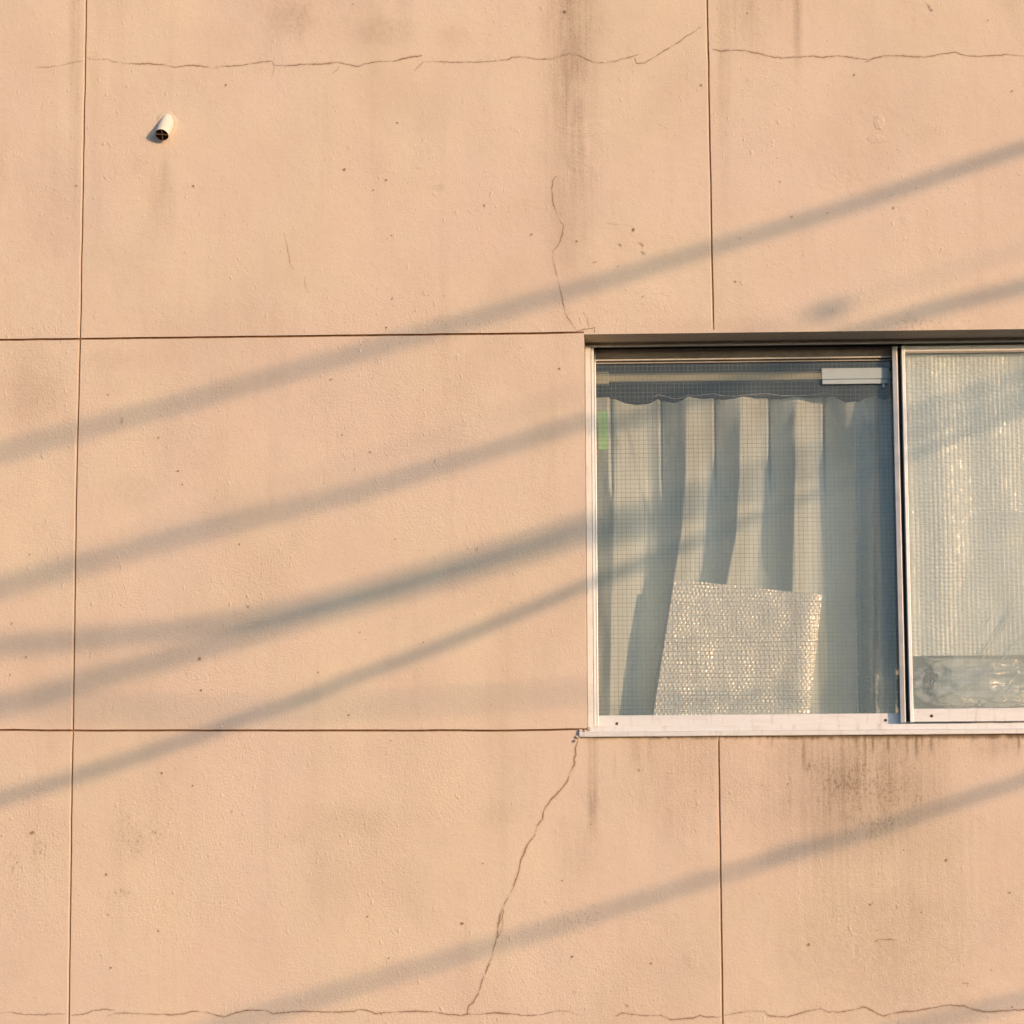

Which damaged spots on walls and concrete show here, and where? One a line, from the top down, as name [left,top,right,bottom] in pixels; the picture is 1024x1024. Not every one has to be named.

crack [153,742,578,1017]
crack [768,1005,1024,1017]